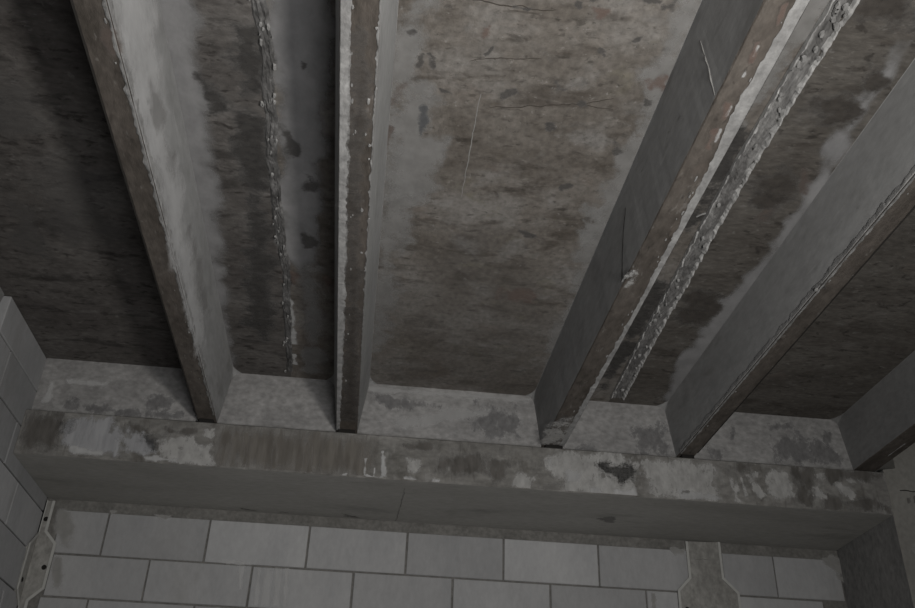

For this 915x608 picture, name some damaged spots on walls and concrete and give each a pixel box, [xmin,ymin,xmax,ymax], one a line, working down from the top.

crack [476,0,554,11]
leakage [853,0,915,33]
crack [491,98,614,110]
leakage [372,0,451,351]
leakage [102,0,387,478]
leakage [546,0,830,447]
leakage [630,61,915,456]
leakage [64,394,184,419]
leakage [730,422,892,514]